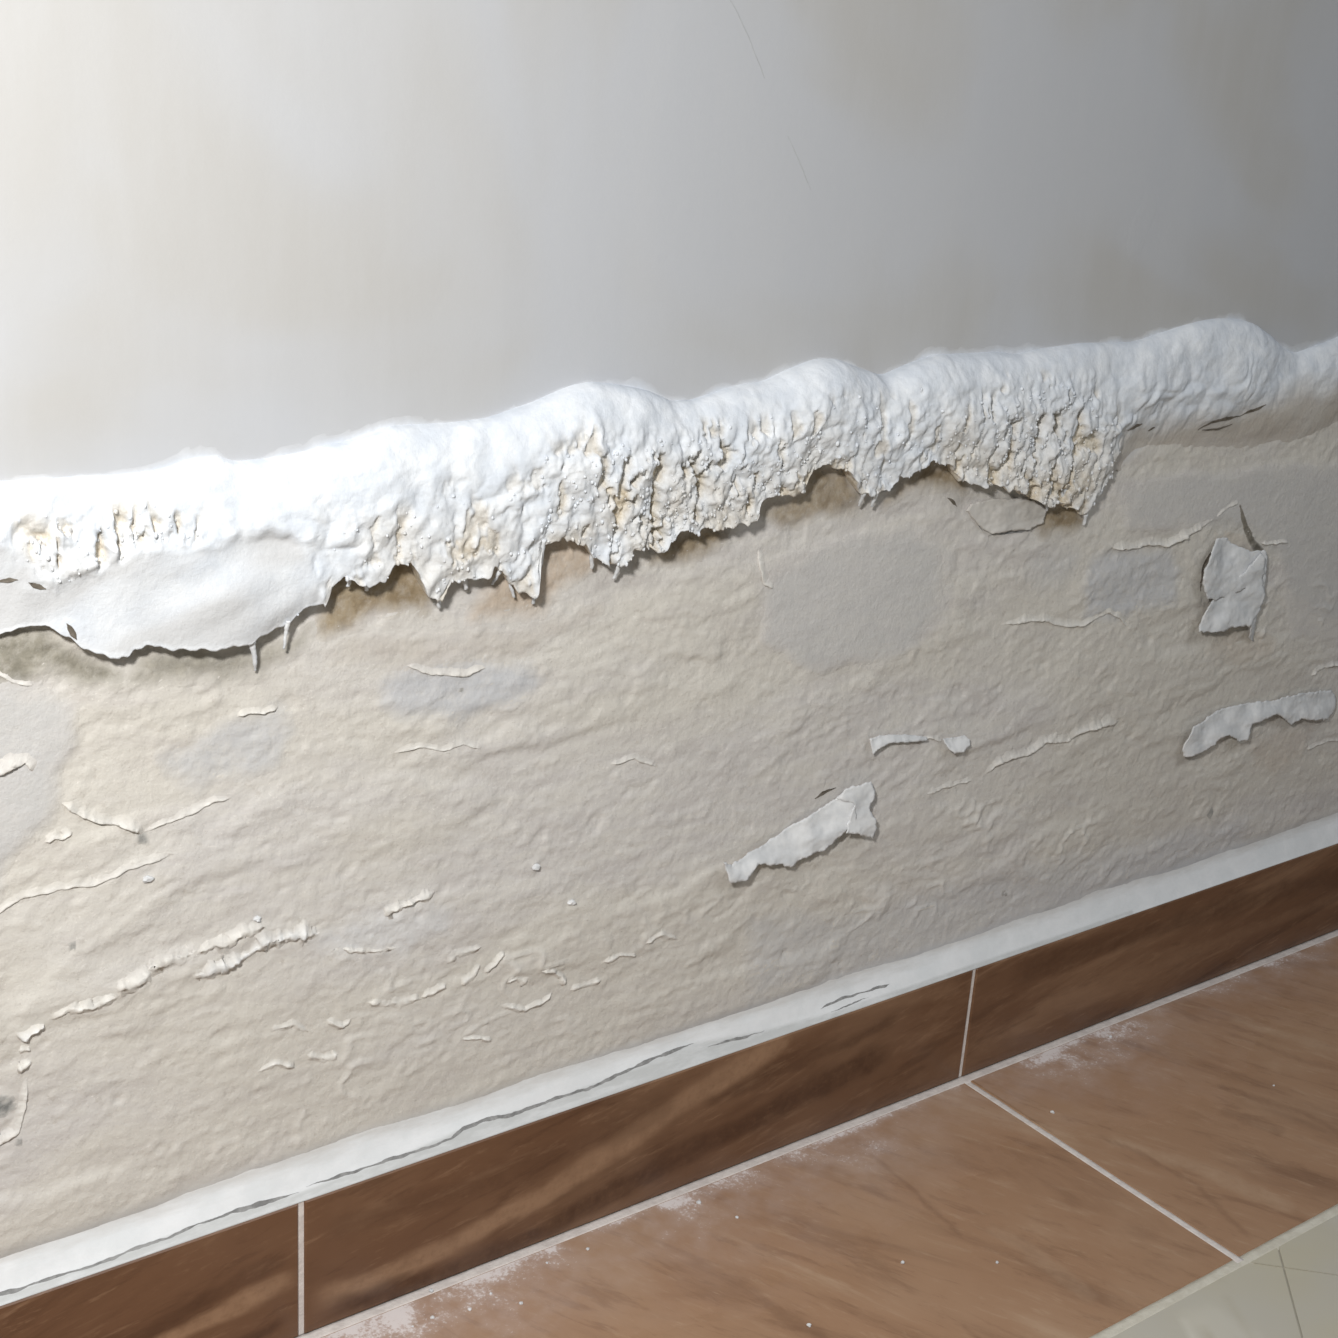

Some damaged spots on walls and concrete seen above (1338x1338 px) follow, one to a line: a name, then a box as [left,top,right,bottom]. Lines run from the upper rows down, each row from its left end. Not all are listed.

damp [0,312,1338,695]
peeling [1109,500,1288,641]
peeling [0,752,37,776]
peeling [407,663,486,677]
peeling [869,734,971,755]
peeling [1182,660,1338,757]
peeling [724,782,877,883]